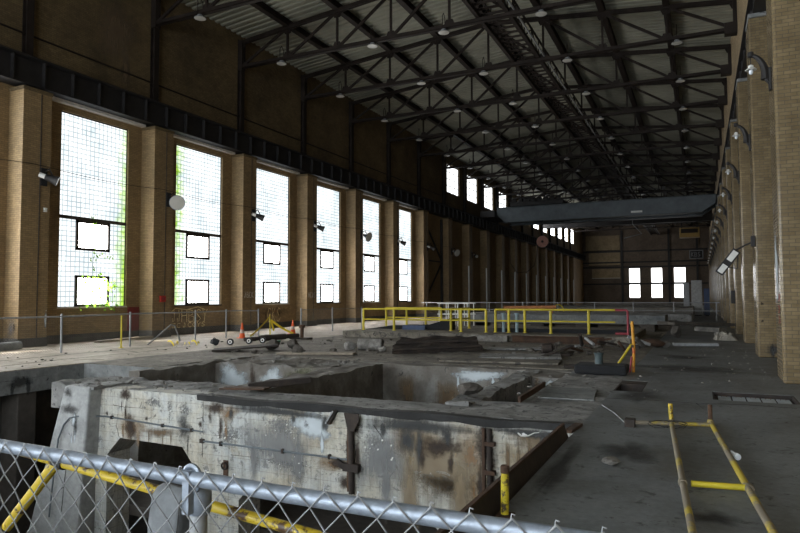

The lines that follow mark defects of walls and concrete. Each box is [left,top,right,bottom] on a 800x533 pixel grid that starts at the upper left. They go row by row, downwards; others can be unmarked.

rust [122,416,139,443]
rust [322,424,361,489]
rust [398,427,496,511]
rust [511,444,534,464]